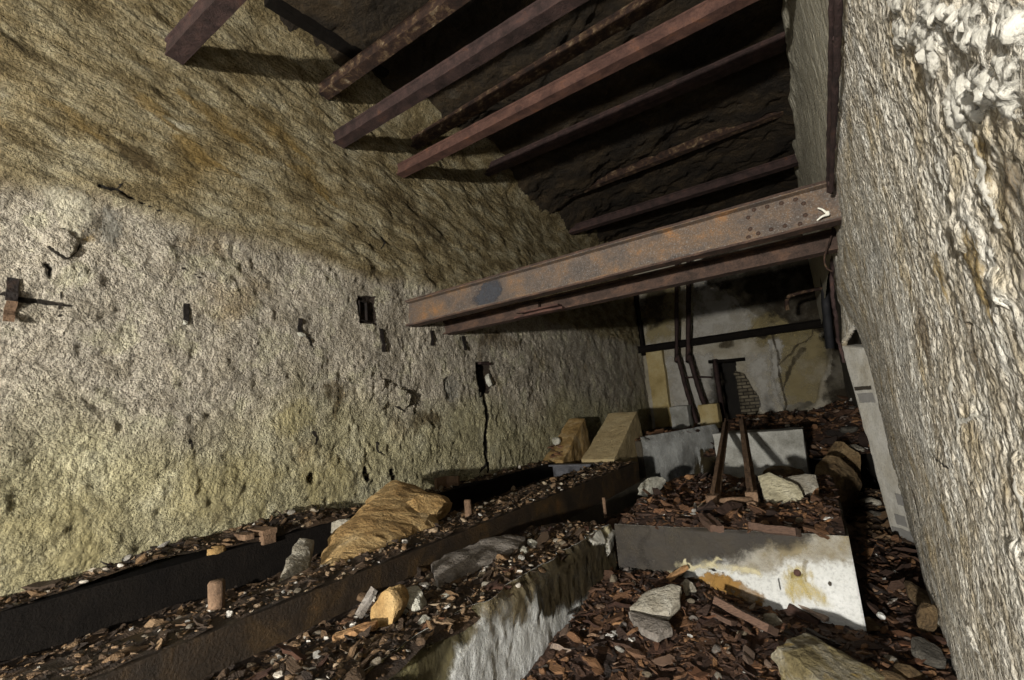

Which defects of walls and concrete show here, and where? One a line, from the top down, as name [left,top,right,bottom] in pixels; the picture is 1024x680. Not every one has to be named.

damp [886,0,1024,229]
crack [98,183,160,211]
spalling [665,281,826,416]
crack [772,329,813,411]
crack [478,389,489,473]
damp [457,524,851,643]